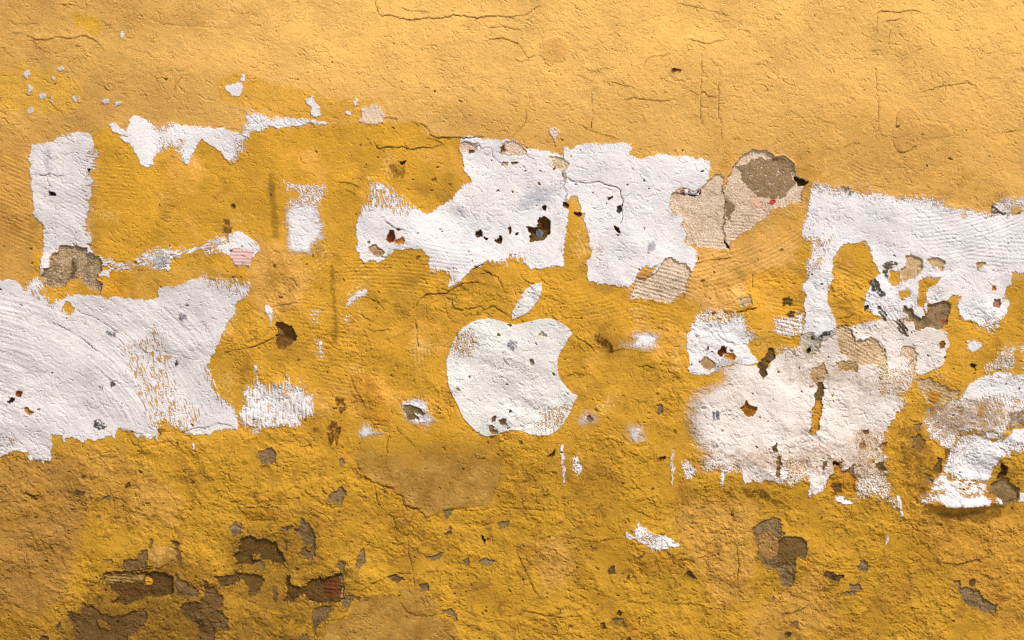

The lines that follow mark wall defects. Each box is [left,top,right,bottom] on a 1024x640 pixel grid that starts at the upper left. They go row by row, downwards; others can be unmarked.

spalling [669,149,808,250]
spalling [41,243,103,292]
spalling [368,230,405,258]
spalling [475,206,550,244]
spalling [903,301,951,349]
peeling [700,346,736,370]
peeling [757,348,776,379]
peeling [800,325,888,435]
peeling [740,401,757,417]
peeling [822,461,861,495]
spalling [752,517,808,587]
peeling [40,518,366,640]